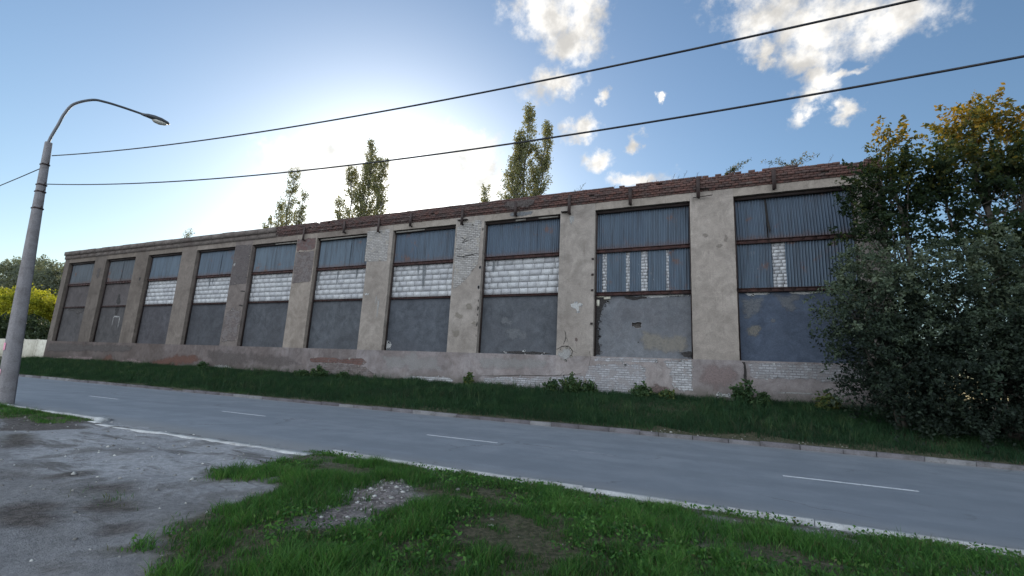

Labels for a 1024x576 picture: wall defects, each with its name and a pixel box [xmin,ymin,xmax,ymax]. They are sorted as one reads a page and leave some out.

flaking render [365,229,390,262]
flaking render [453,220,483,289]
flaking render [308,357,375,379]
flaking render [484,296,693,394]